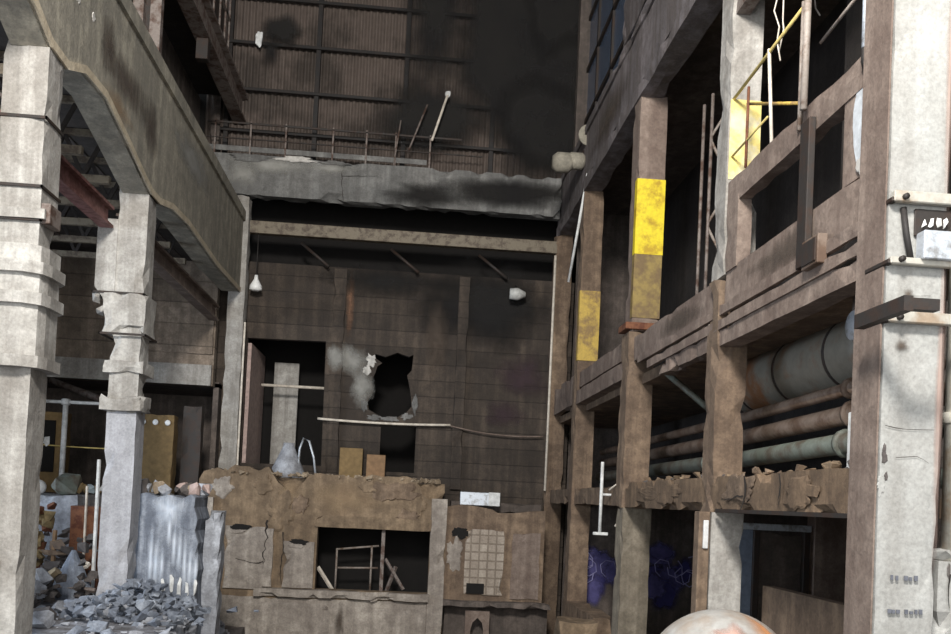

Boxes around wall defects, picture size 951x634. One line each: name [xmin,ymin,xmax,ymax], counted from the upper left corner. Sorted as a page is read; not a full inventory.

leakage [529,0,579,53]
leakage [503,83,575,164]
leakage [395,186,451,206]
flaking render [330,348,418,422]
spalling [212,476,235,499]
spalling [721,472,756,503]
spalling [786,475,820,511]
crack [236,520,284,584]
spalling [288,539,309,548]